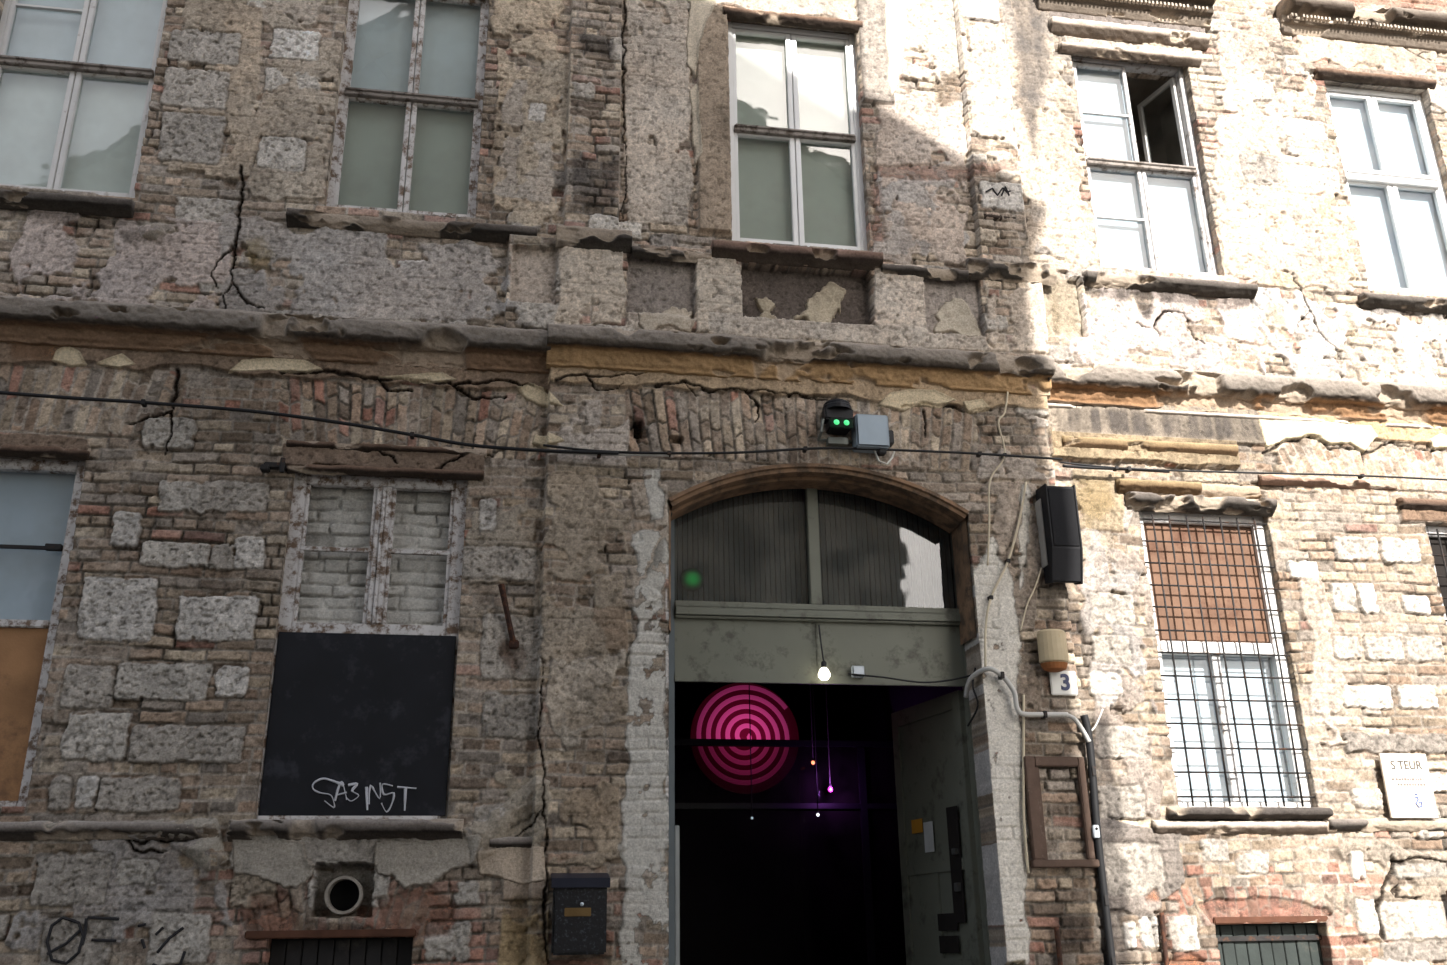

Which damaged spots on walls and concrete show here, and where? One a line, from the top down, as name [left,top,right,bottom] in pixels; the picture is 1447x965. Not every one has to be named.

crack [211,166,265,309]
flaking render [755,282,846,322]
crack [1135,310,1205,345]
crack [1293,280,1341,359]
crack [129,369,180,455]
crack [280,369,829,423]
flaking render [877,389,991,415]
flaking render [1258,419,1378,454]
flaking render [1428,433,1447,450]
flaking render [232,835,315,889]
flaking render [374,834,546,935]
crack [1374,856,1446,940]